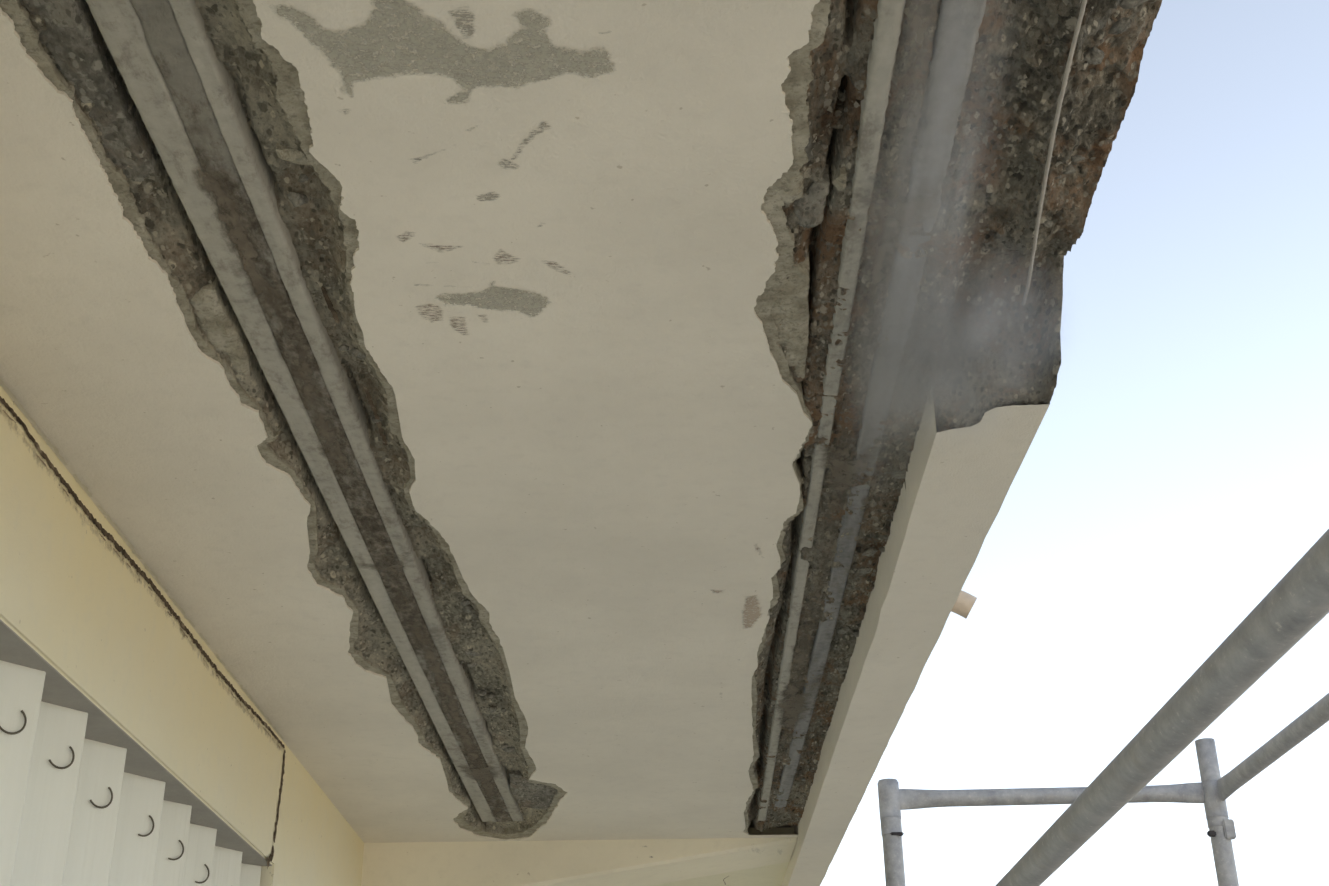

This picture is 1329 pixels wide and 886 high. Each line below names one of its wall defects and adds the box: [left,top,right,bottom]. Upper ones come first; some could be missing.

spalling [0,0,613,839]
spalling [744,0,1162,833]